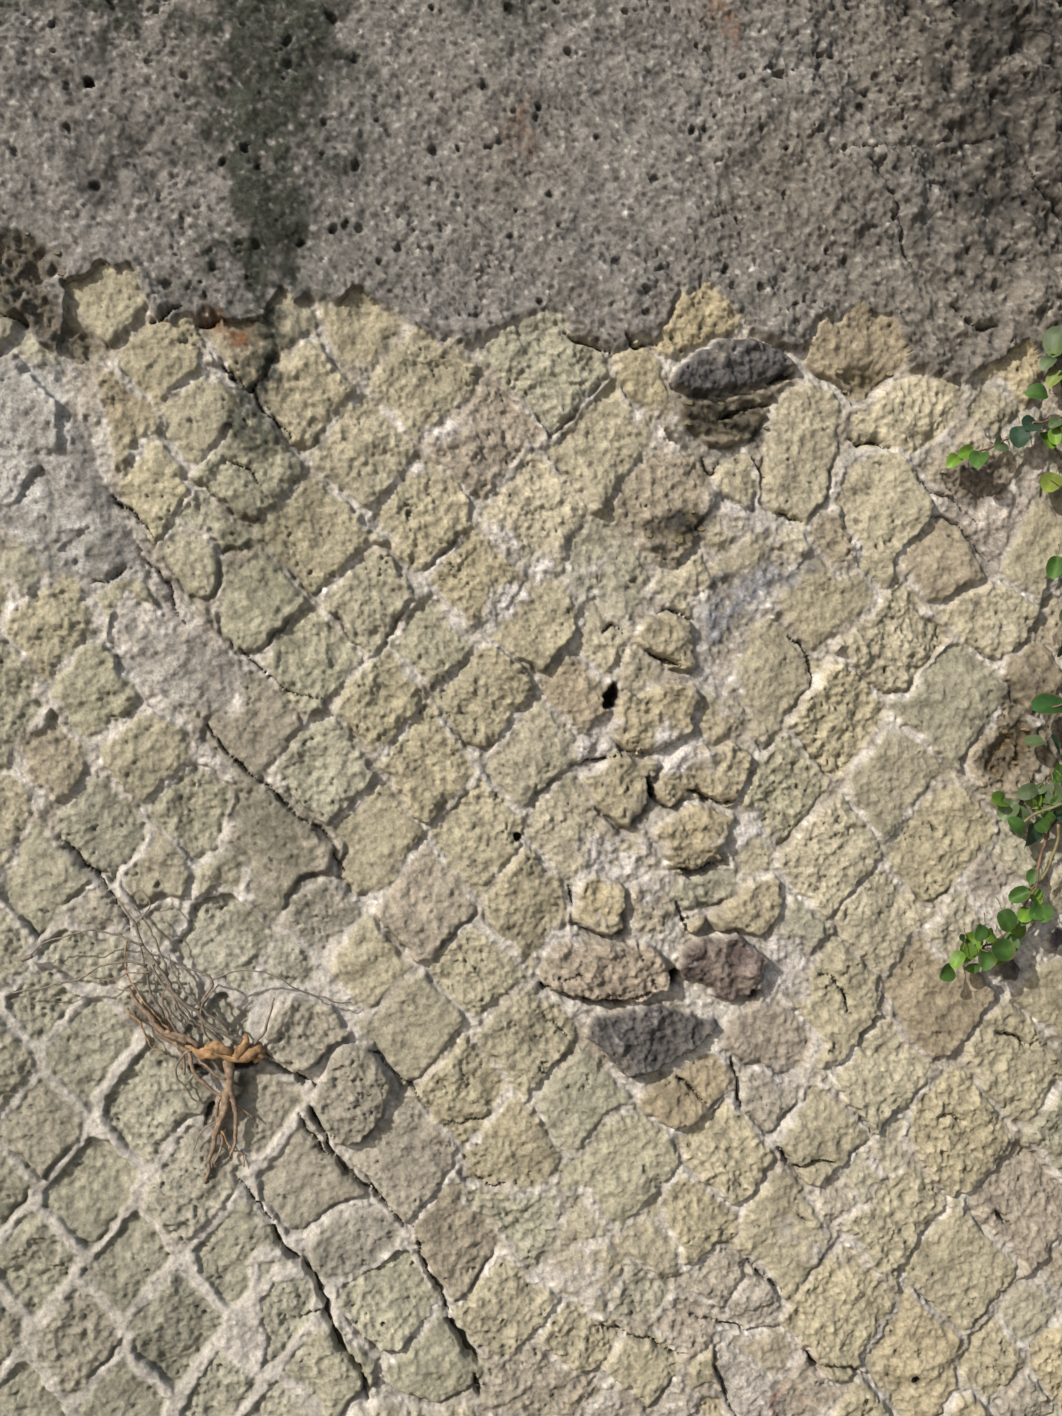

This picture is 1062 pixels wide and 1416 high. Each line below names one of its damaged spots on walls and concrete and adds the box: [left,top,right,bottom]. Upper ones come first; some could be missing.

crack [847,134,1055,214]
crack [207,724,345,870]
crack [234,1174,367,1382]
crack [265,1050,480,1391]